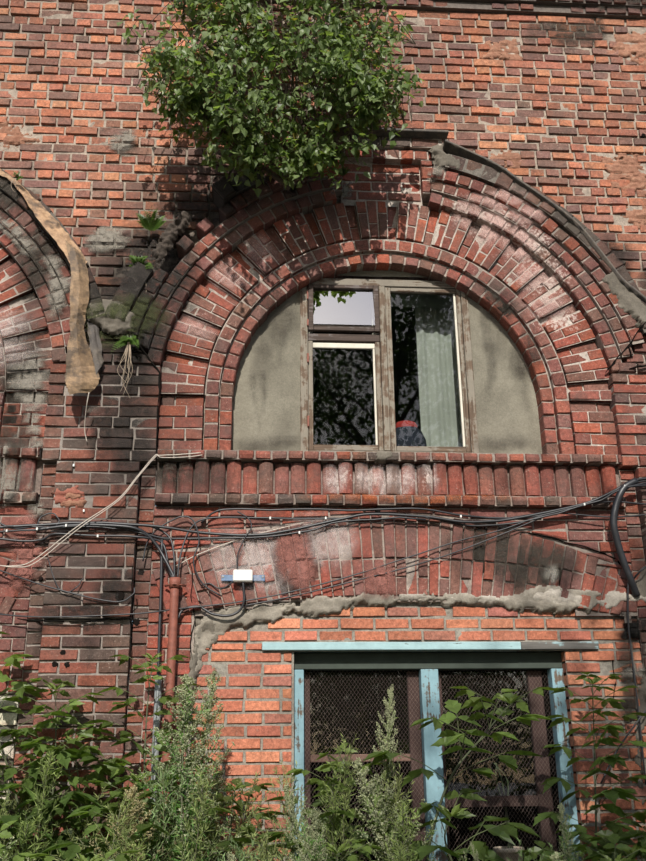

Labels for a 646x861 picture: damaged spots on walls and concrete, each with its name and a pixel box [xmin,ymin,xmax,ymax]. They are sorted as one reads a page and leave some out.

crack [605,322,646,373]
spalling [366,567,393,596]